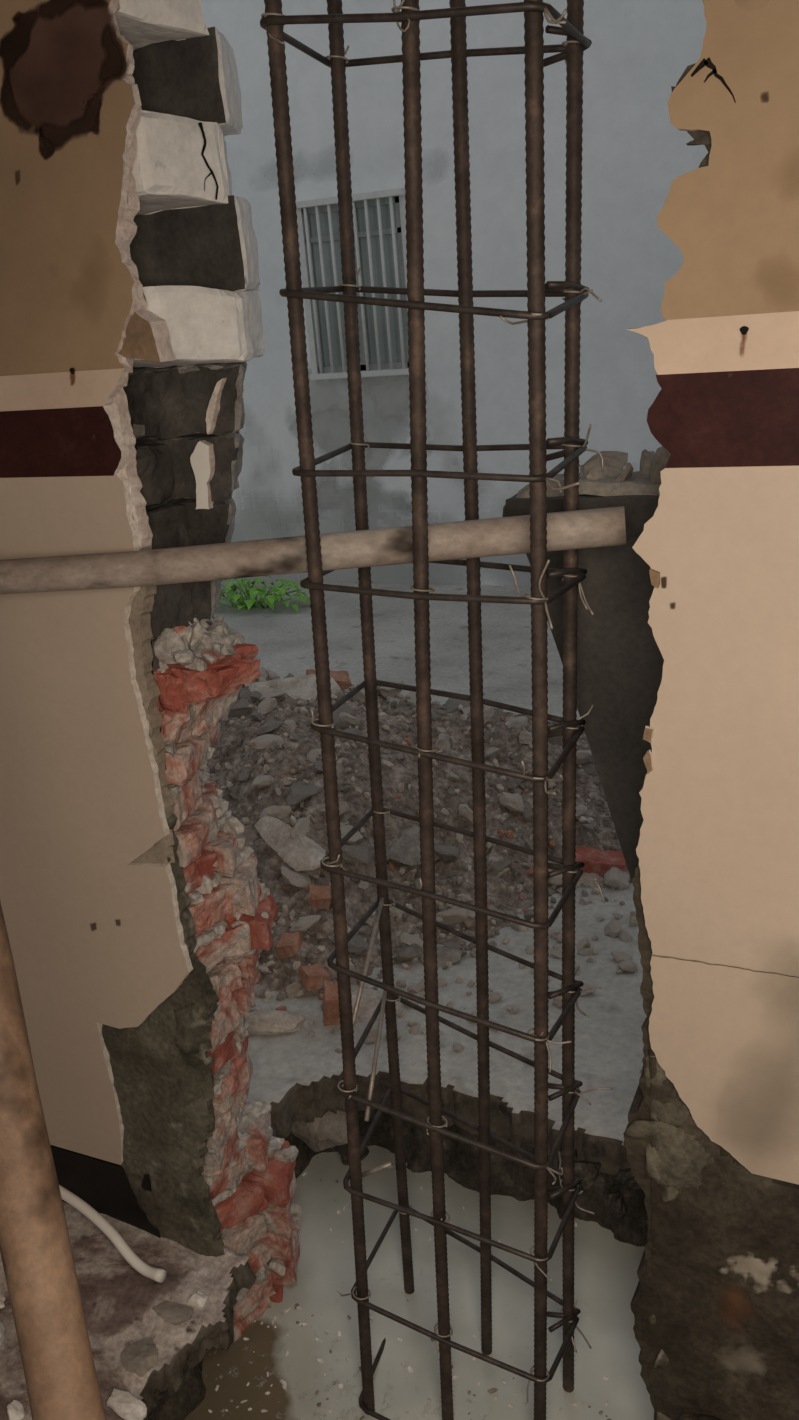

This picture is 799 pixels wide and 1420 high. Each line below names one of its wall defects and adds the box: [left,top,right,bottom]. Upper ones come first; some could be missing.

crack [691,57,736,103]
crack [198,122,219,200]
flaking render [650,569,675,609]
flaking render [643,726,654,774]
spalling [131,829,175,864]
crack [651,955,799,978]
spalling [102,979,225,1257]
spalling [636,1050,799,1420]
damp [722,1256,794,1293]